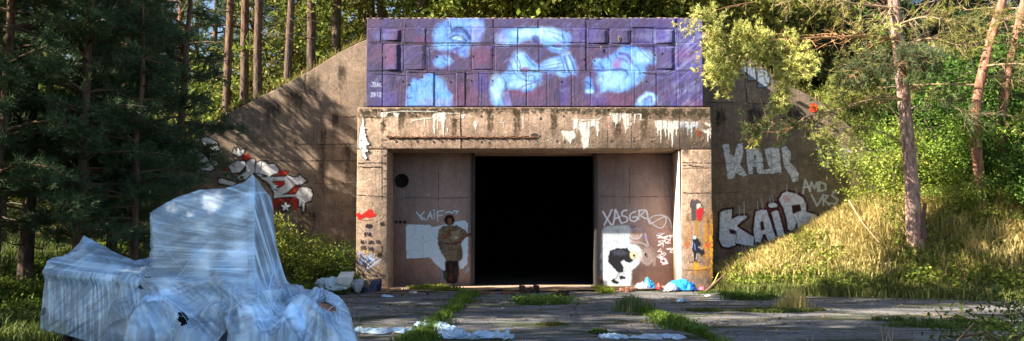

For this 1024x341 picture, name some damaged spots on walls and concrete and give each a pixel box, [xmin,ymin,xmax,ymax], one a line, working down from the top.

water stain [551,111,711,154]